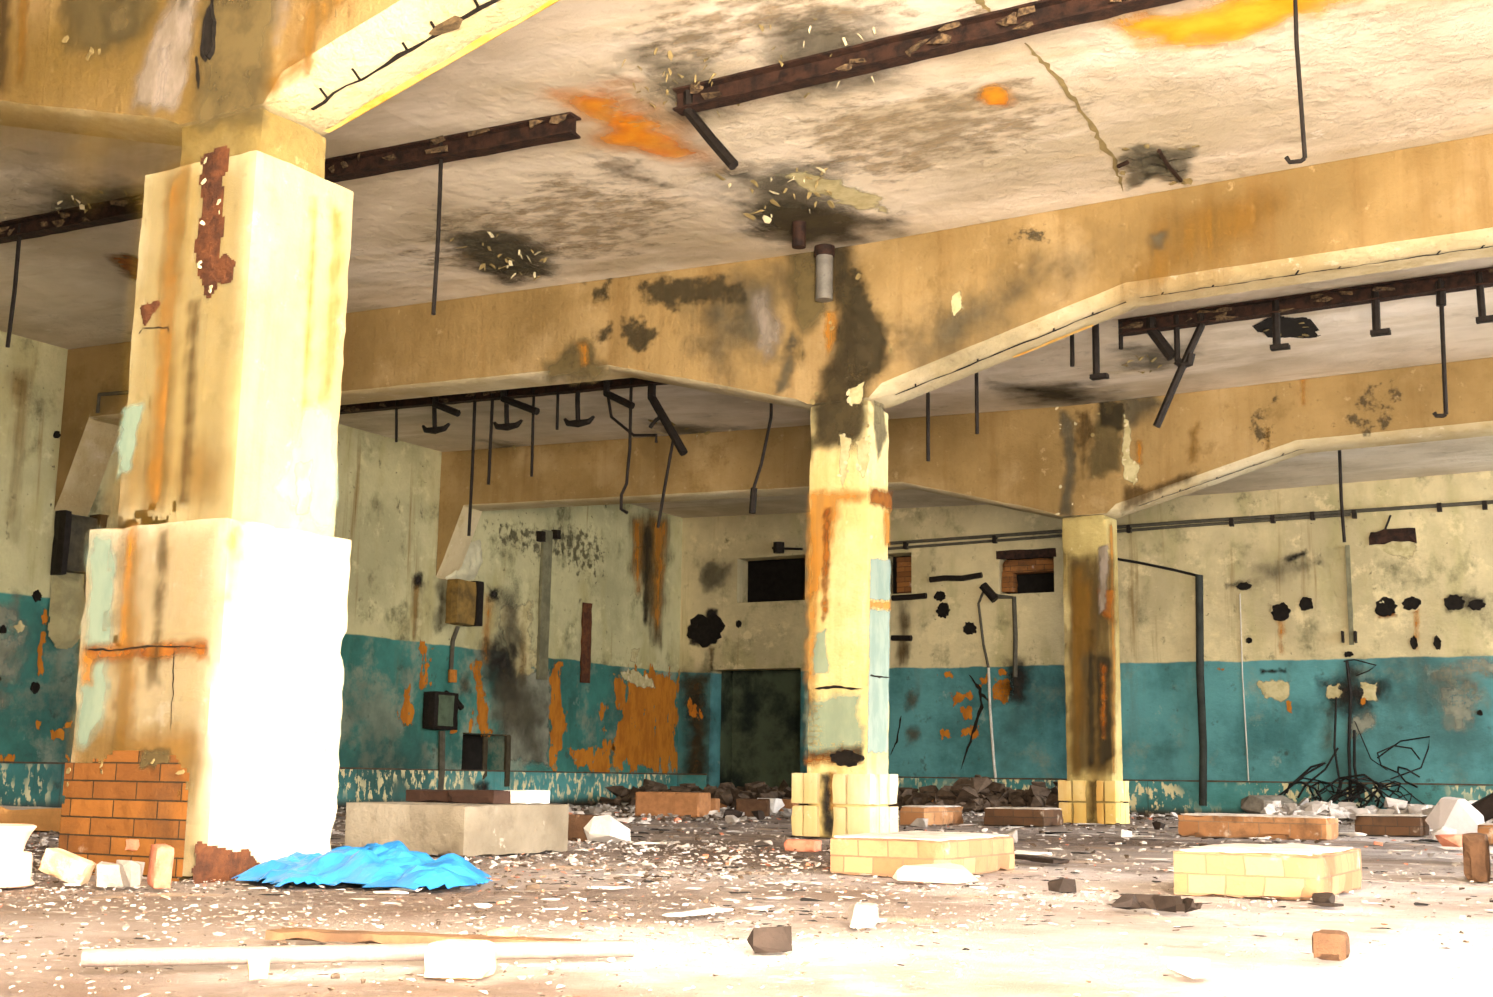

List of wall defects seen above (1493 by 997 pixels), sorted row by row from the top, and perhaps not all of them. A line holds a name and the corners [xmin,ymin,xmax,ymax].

damp [134,0,277,126]
corrosion [325,0,560,133]
corrosion [529,95,705,158]
crack [975,0,991,12]
crack [1024,43,1123,190]
corrosion [1110,0,1338,46]
spalling [194,145,236,299]
damp [638,172,892,447]
damp [484,589,537,681]
corrosion [807,489,892,679]
peeling [450,648,703,775]
peeling [937,668,1013,740]